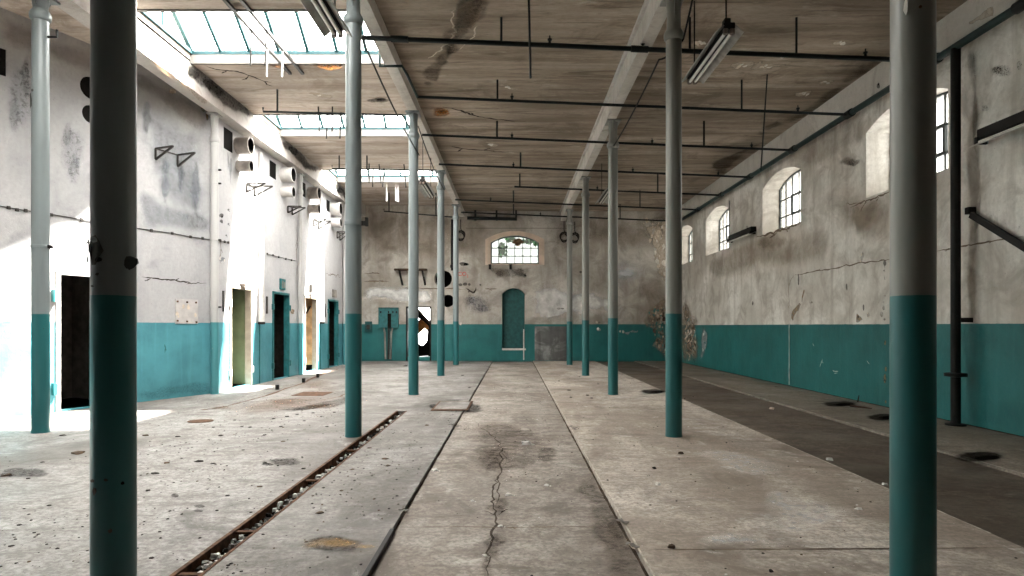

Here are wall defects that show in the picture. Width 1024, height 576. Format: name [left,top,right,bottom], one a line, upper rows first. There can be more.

crack [145,276,202,284]
crack [788,259,889,295]
flaking render [645,300,666,353]
peeling [682,307,707,362]
crack [476,422,507,575]